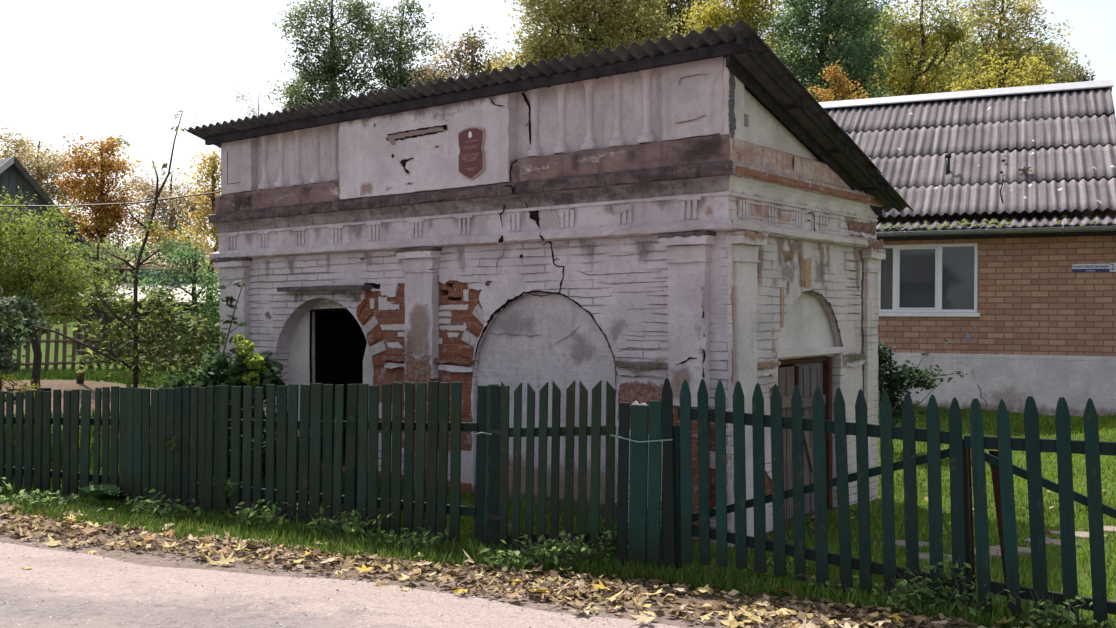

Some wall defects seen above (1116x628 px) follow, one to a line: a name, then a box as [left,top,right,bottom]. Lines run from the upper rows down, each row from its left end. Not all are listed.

spalling [373,123,448,185]
crack [490,93,531,269]
spalling [356,280,490,451]
crack [473,233,706,390]
flaking render [757,250,812,352]